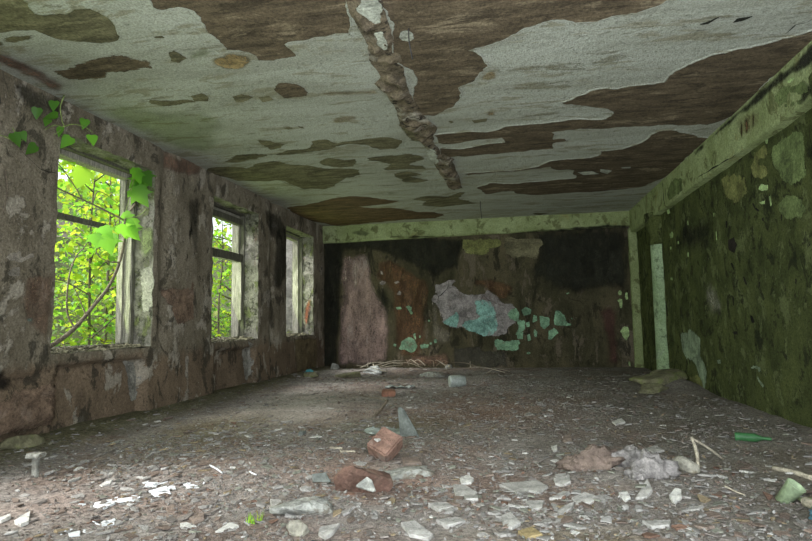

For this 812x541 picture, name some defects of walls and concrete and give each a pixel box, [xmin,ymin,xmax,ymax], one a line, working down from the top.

peeling [0,0,122,45]
peeling [54,55,152,80]
peeling [149,0,812,226]
damp [294,236,462,372]
peeling [432,280,573,354]